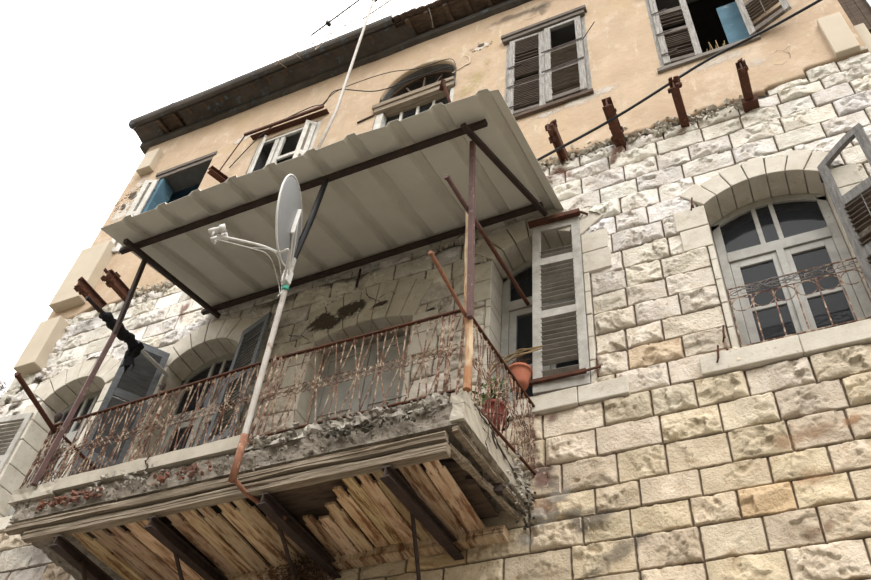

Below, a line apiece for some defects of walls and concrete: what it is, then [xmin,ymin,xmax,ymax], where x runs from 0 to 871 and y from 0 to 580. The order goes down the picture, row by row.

peeling [565,87,613,108]
spalling [623,95,744,144]
spalling [538,138,611,170]
spalling [111,178,146,221]
spalling [244,390,487,472]
spalling [8,454,229,522]
spalling [490,425,569,543]